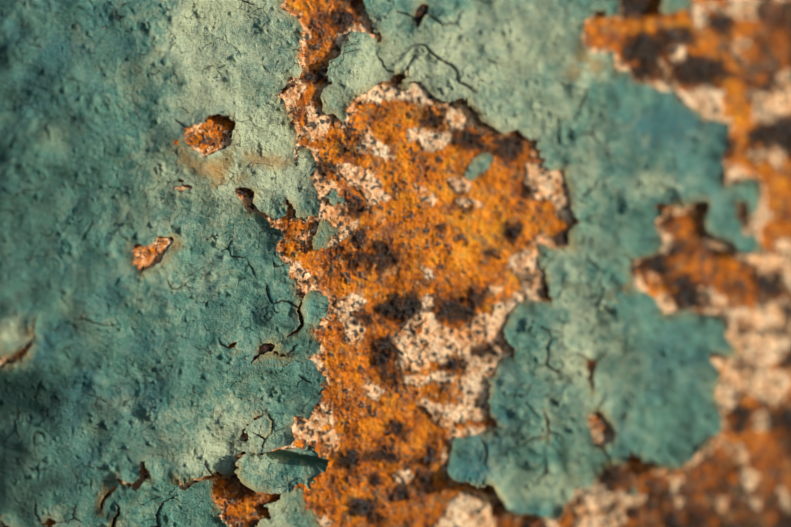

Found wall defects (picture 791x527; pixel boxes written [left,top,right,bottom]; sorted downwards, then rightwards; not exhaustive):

rust [621,13,741,90]
rust [744,114,791,163]
peeling [131,236,174,274]
crack [221,241,303,355]
rust [346,290,481,326]
peeling [173,0,791,527]
rust [638,241,714,313]
peeling [0,317,36,371]
crack [481,327,563,469]
peeling [117,461,151,490]
crack [35,503,82,523]
crack [100,486,120,527]